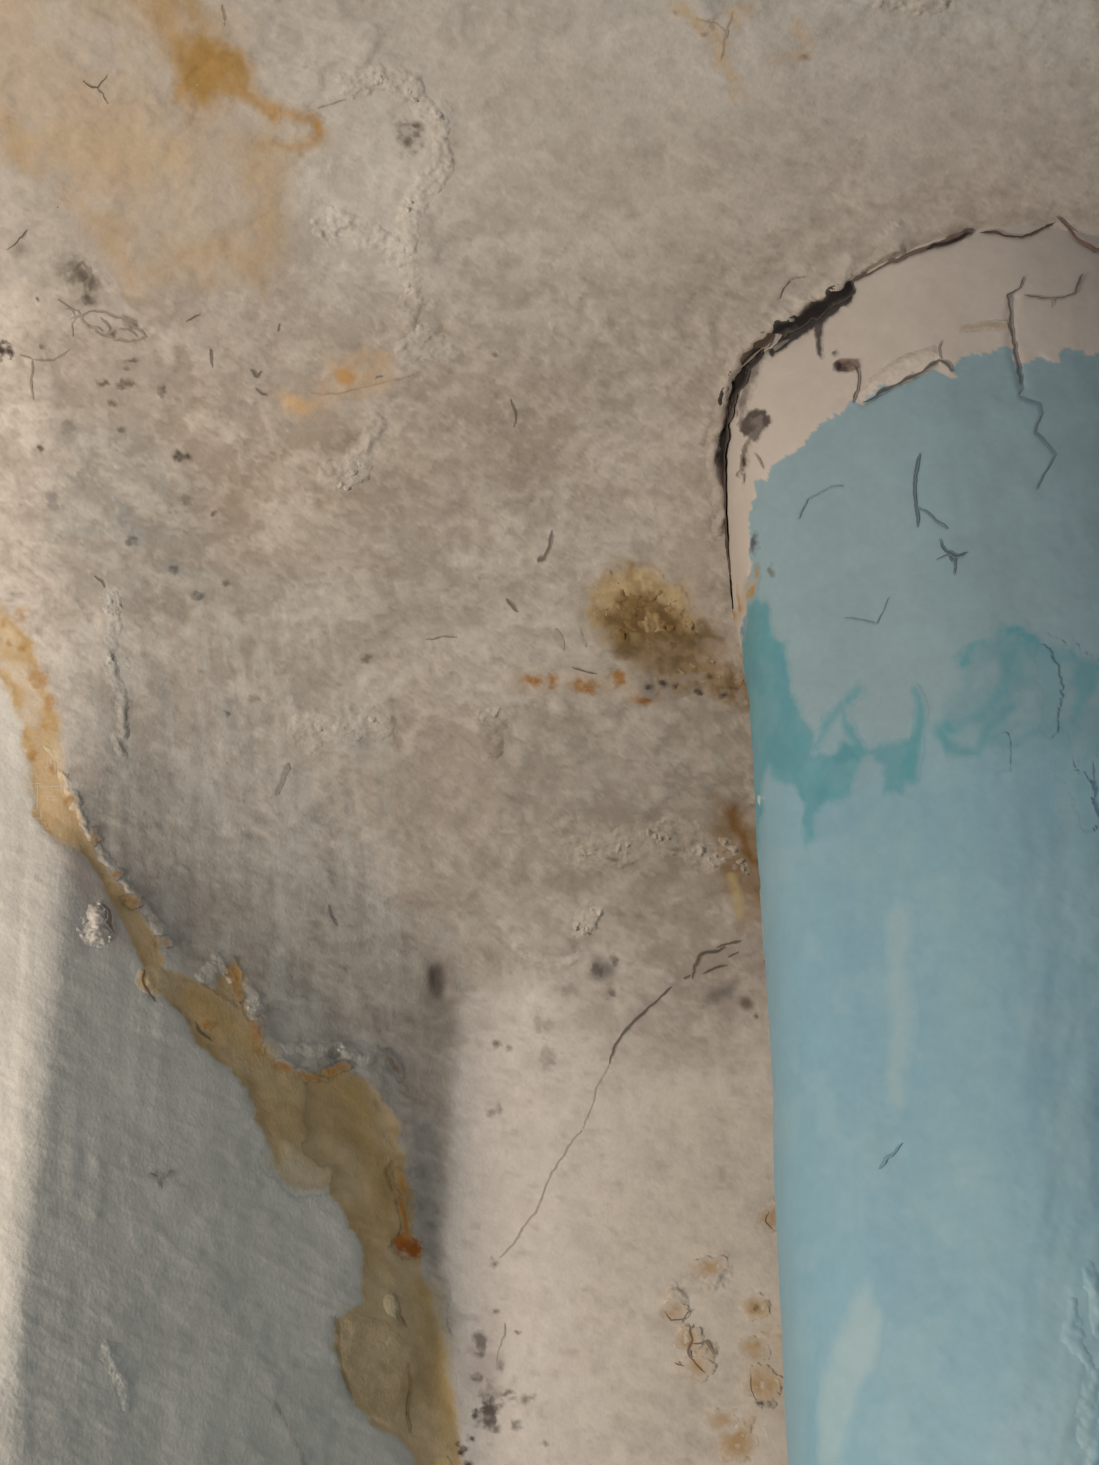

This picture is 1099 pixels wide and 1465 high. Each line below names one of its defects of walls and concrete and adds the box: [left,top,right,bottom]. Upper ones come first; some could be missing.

water stain [0,0,350,435]
water stain [257,341,412,427]
spalling [735,283,863,484]
crack [717,216,1099,612]
corrosion [500,661,665,714]
peeling [559,592,1099,955]
spalling [30,745,466,1465]
water stain [408,947,465,1019]
mould [490,952,622,1075]
crack [499,940,741,1258]
water stain [695,975,759,1020]
water stain [452,1301,537,1465]